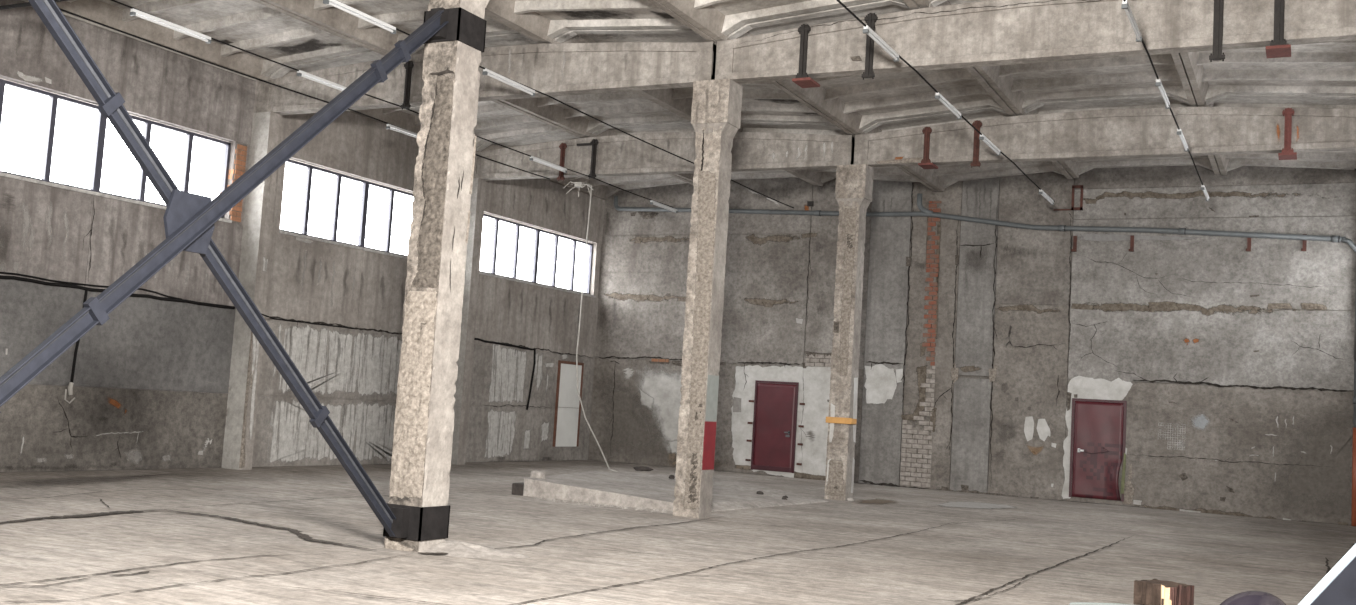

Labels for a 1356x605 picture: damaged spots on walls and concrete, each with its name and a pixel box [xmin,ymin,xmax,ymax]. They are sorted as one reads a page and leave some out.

crack [0,489,449,605]
peeling [604,129,1039,509]
crack [493,190,1354,605]
peeling [1024,376,1133,499]